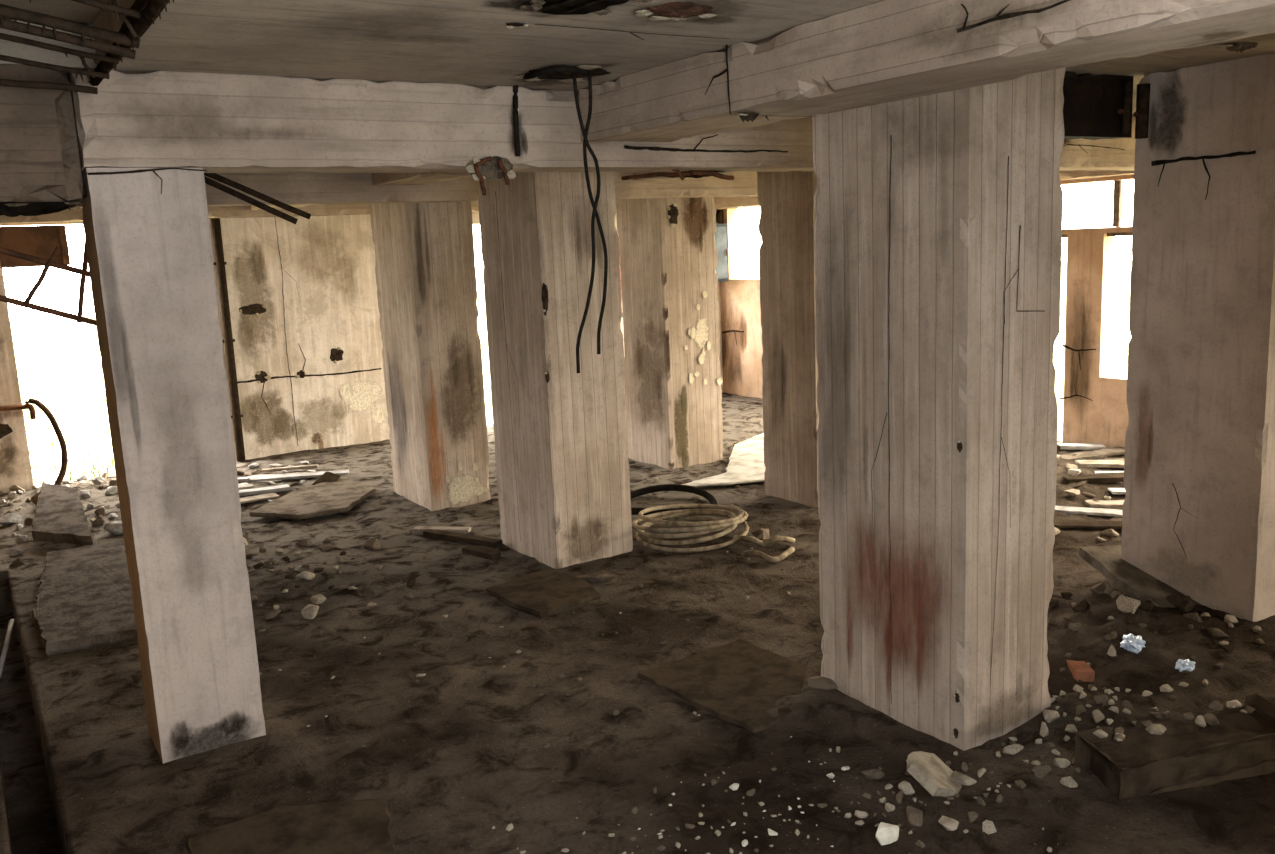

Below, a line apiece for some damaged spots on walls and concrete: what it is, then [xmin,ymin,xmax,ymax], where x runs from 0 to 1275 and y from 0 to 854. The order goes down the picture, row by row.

water stain [242,393,294,444]
rust [429,376,445,493]